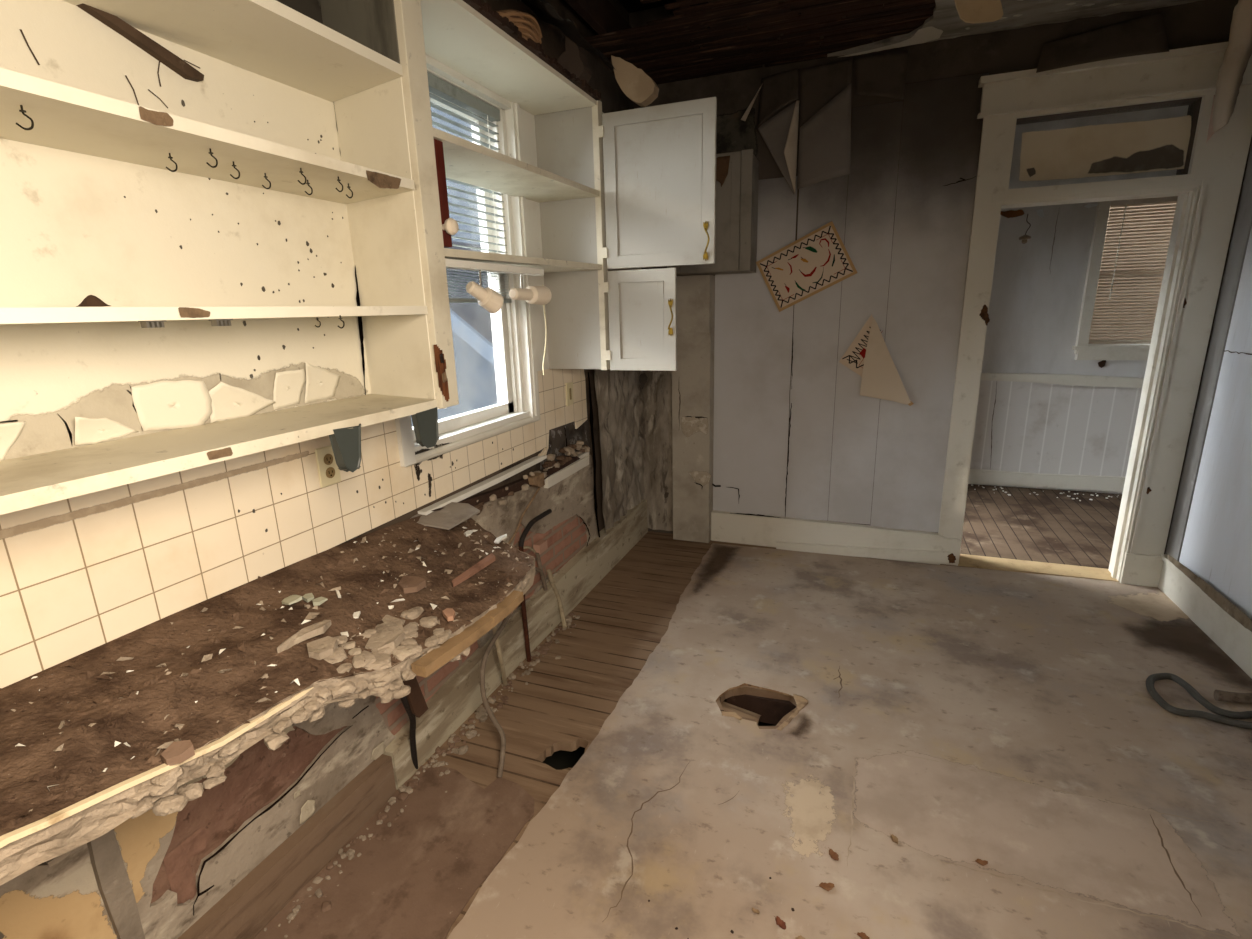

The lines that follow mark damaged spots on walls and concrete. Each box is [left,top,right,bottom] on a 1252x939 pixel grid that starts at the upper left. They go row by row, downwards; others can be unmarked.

peeling [840,26,943,57]
peeling [1019,115,1192,181]
peeling [0,363,367,461]
leakage [1129,621,1252,687]
spalling [44,850,72,867]
spalling [114,725,347,904]
crack [605,763,689,919]
peeling [0,890,117,939]